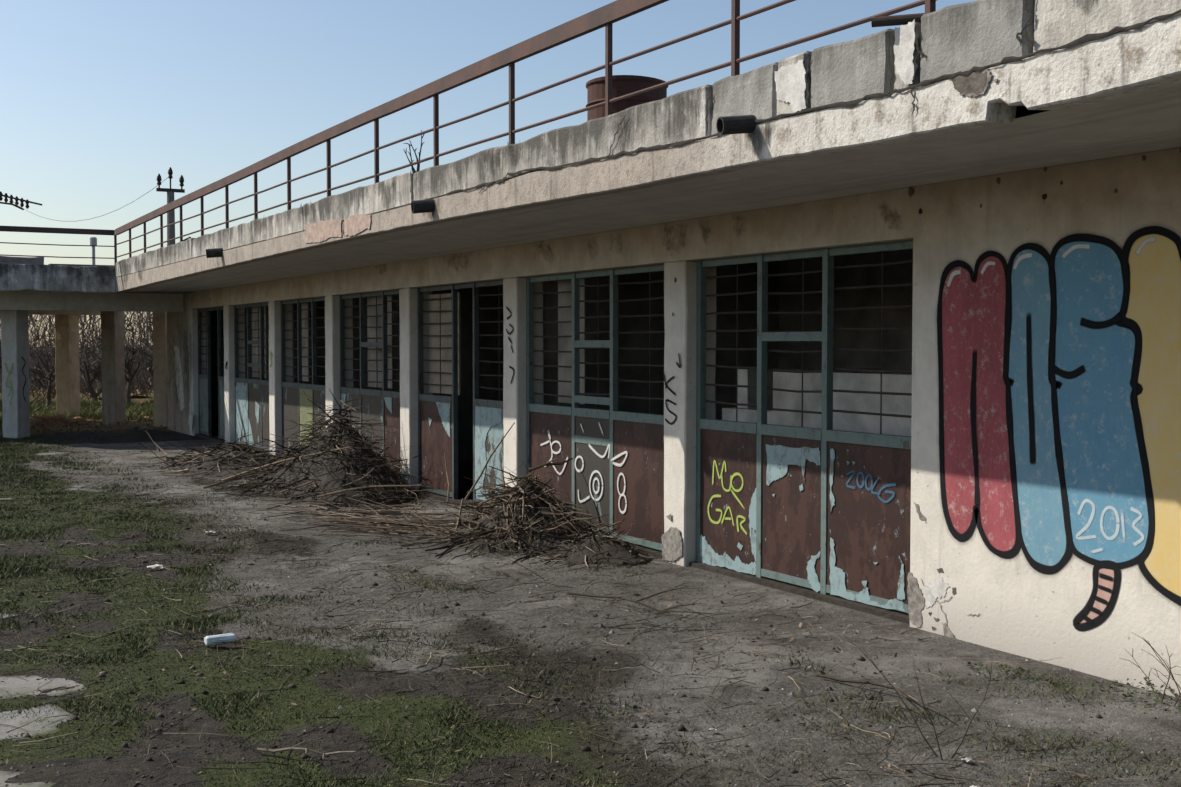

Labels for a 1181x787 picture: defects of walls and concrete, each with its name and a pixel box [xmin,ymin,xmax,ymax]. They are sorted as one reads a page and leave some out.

crack [754,0,1181,123]
spalling [951,68,998,98]
crack [447,91,719,194]
damp [745,121,769,154]
peeling [428,402,450,437]
peeling [475,406,502,489]
spalling [661,514,683,562]
peeling [700,444,856,575]
peeling [806,537,956,639]